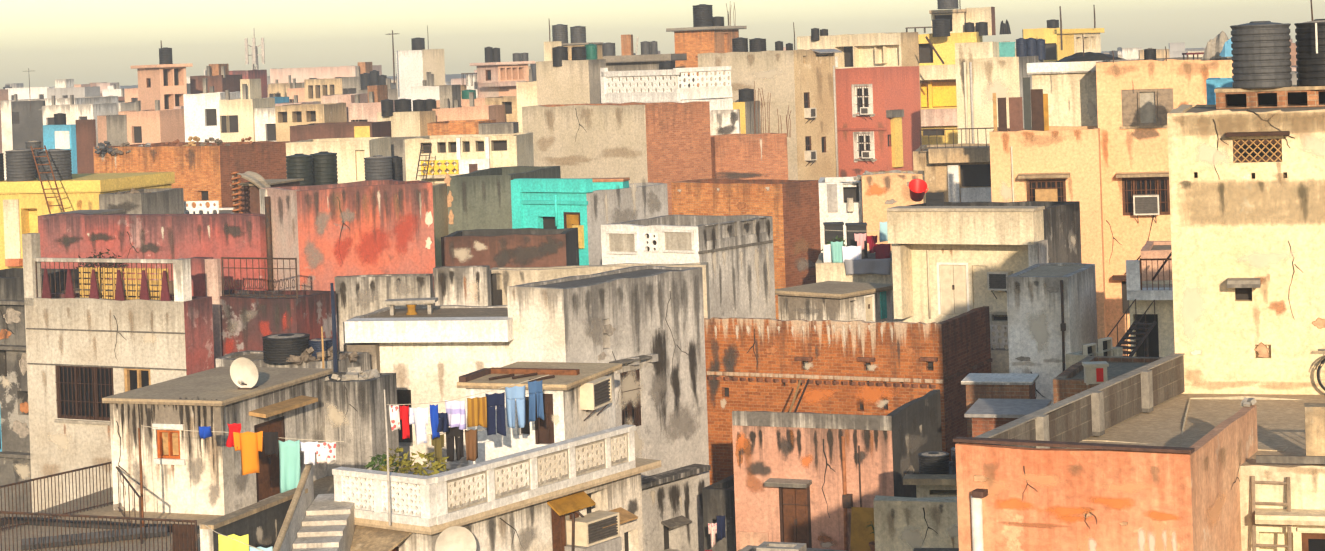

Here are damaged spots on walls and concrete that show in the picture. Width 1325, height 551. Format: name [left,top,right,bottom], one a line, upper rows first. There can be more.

crack [1212,119,1228,176]
crack [1246,109,1295,148]
water stain [704,220,770,298]
crack [1288,241,1300,318]
spalling [0,308,21,340]
water stain [573,284,699,419]
water stain [713,298,899,368]
spalling [1254,342,1269,358]
spalling [1312,317,1325,329]
spalling [12,402,30,438]
crack [822,439,835,518]
water stain [737,408,935,491]